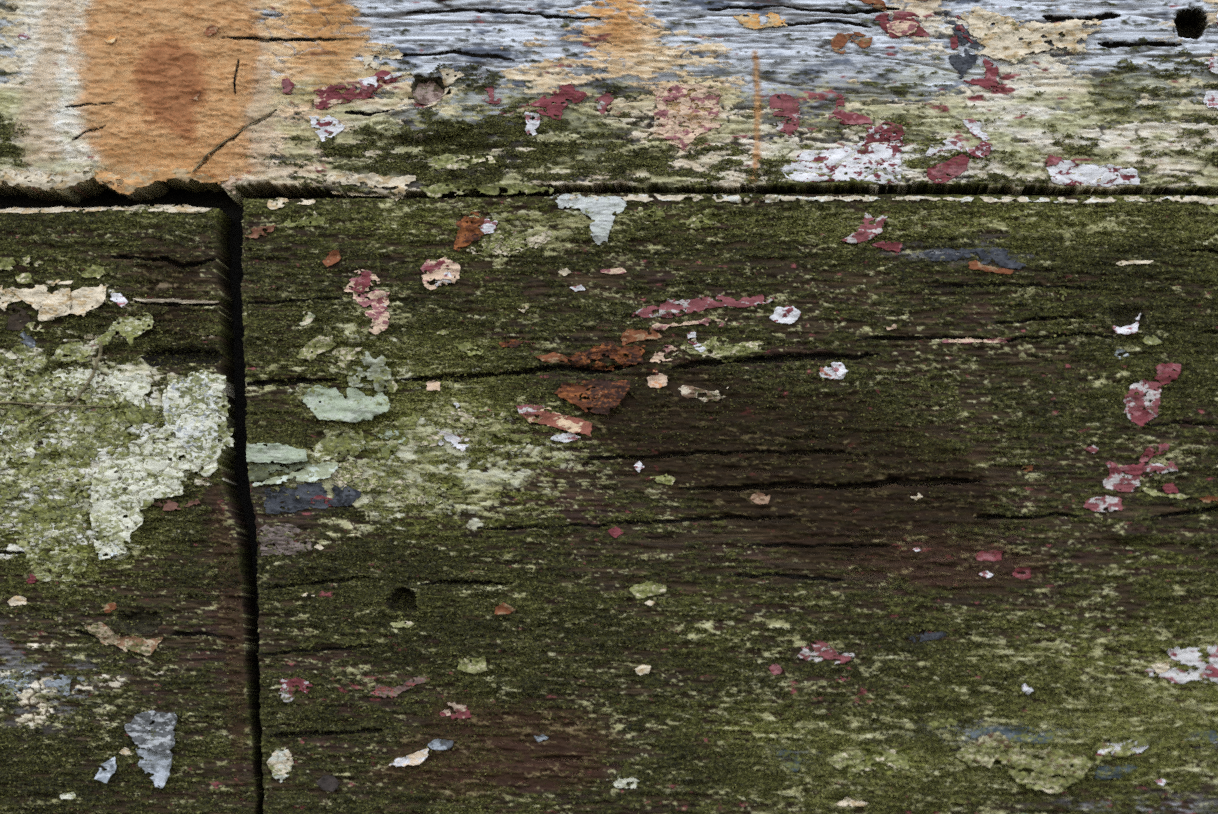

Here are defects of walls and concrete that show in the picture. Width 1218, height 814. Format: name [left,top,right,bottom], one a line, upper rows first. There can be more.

crack [217,36,515,94]
crack [406,8,601,20]
peeling [944,6,1102,92]
crack [344,108,394,116]
peeling [0,166,237,215]
peeling [326,91,1218,290]
crack [247,377,338,386]
crack [400,365,635,382]
peeling [620,294,801,402]
crack [666,283,1115,370]
peeling [0,250,593,606]
peeling [94,711,178,789]